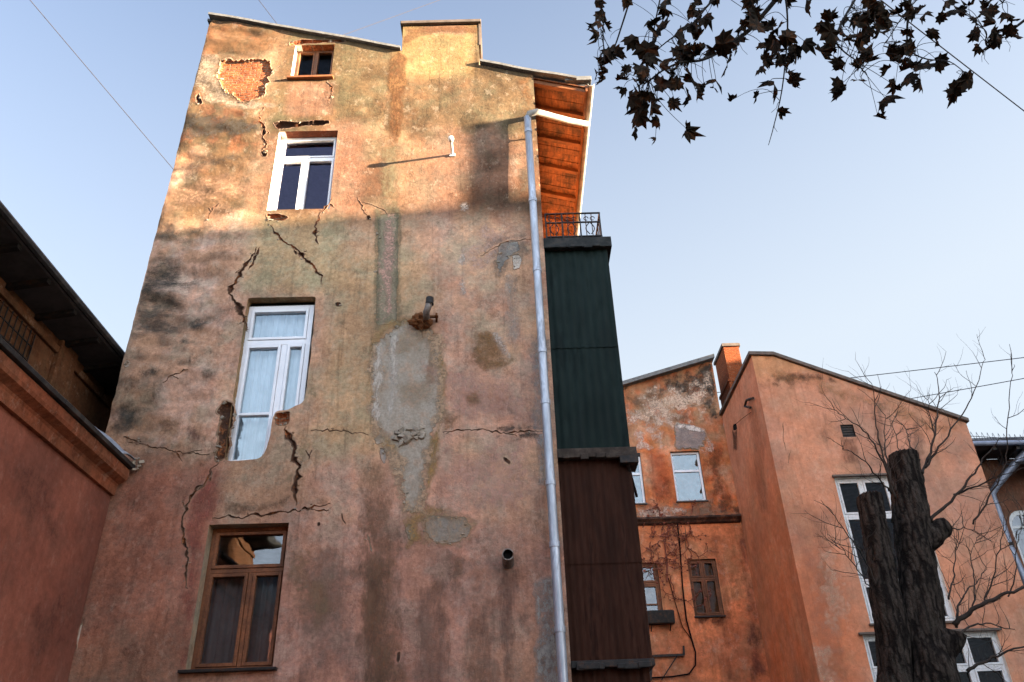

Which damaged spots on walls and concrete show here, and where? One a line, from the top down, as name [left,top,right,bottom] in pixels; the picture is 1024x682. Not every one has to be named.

spalling [195,55,275,109]
crack [258,107,270,151]
water stain [138,260,179,333]
crack [227,198,334,332]
spalling [213,399,237,463]
flaking render [370,318,472,545]
crack [443,428,543,436]
flaking render [627,376,713,451]
crack [123,435,219,589]
crack [212,426,369,524]